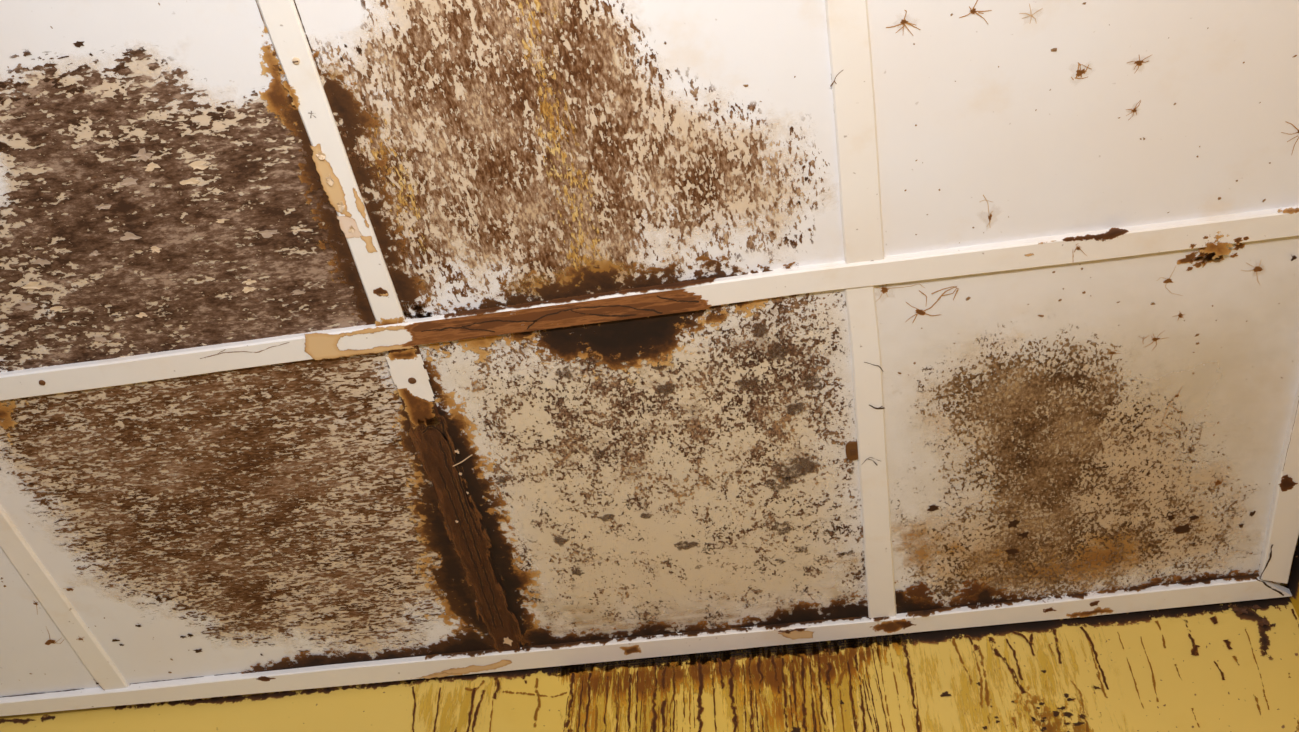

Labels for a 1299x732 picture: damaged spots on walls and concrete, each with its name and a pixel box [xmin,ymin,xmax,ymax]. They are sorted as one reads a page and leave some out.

leakage [0,41,376,372]
peeling [279,65,300,109]
peeling [310,144,377,253]
leakage [312,0,829,319]
peeling [304,277,716,429]
leakage [0,292,1299,732]
peeling [1228,604,1276,660]